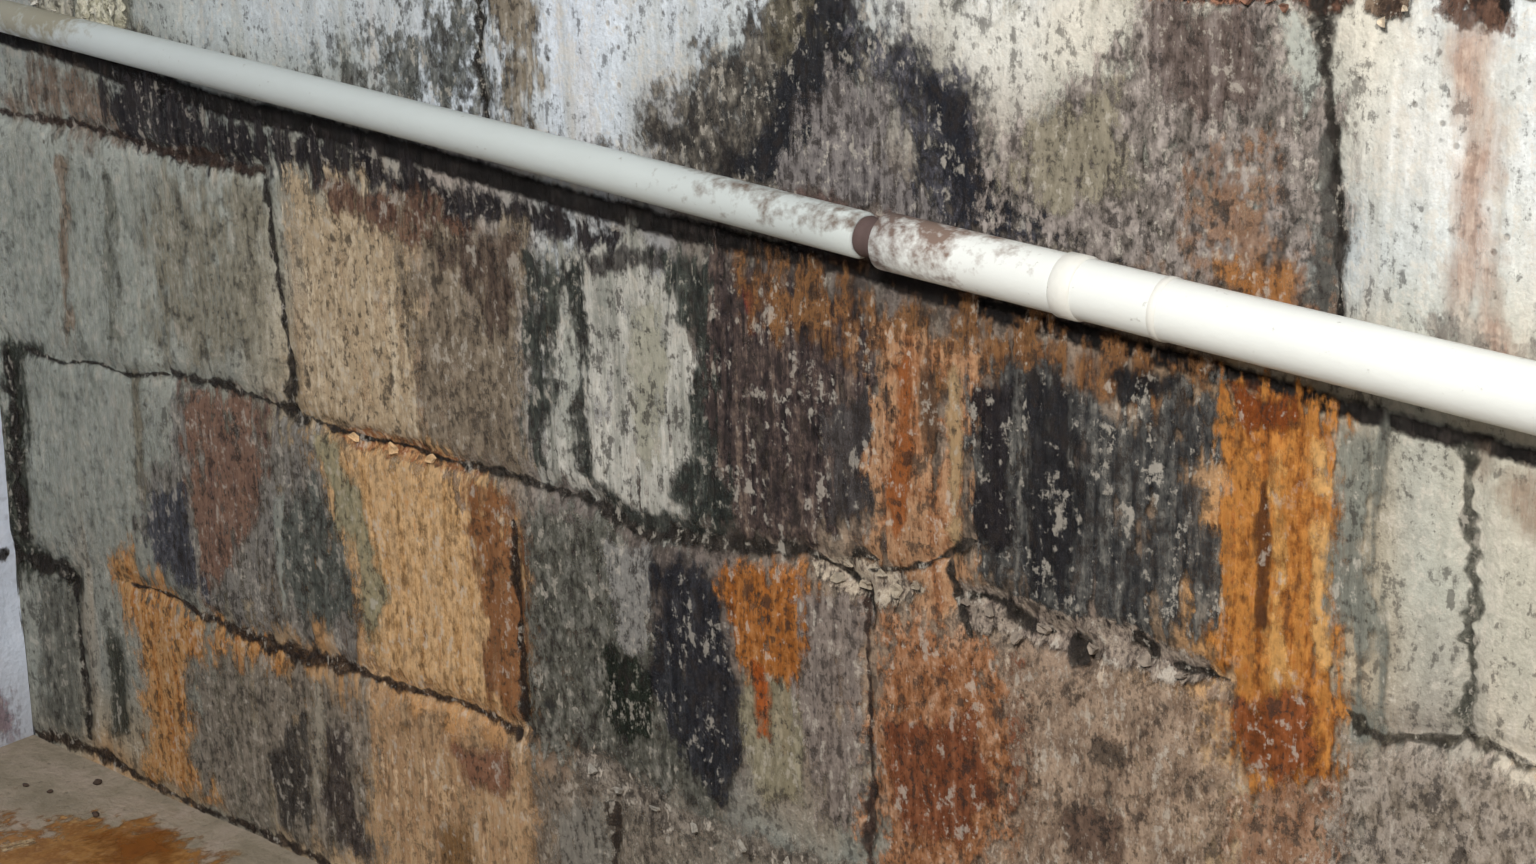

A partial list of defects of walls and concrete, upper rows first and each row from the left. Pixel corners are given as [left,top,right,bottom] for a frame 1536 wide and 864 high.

peeling [29,0,127,29]
crack [473,0,489,118]
water stain [595,0,1356,315]
rust [108,535,308,815]
water stain [0,32,1029,826]
crack [0,108,1092,864]
rust [712,556,820,809]
spalling [812,556,926,611]
rust [734,251,1354,864]
spalling [957,578,1218,684]
water stain [959,312,1536,746]
crack [1346,441,1536,770]